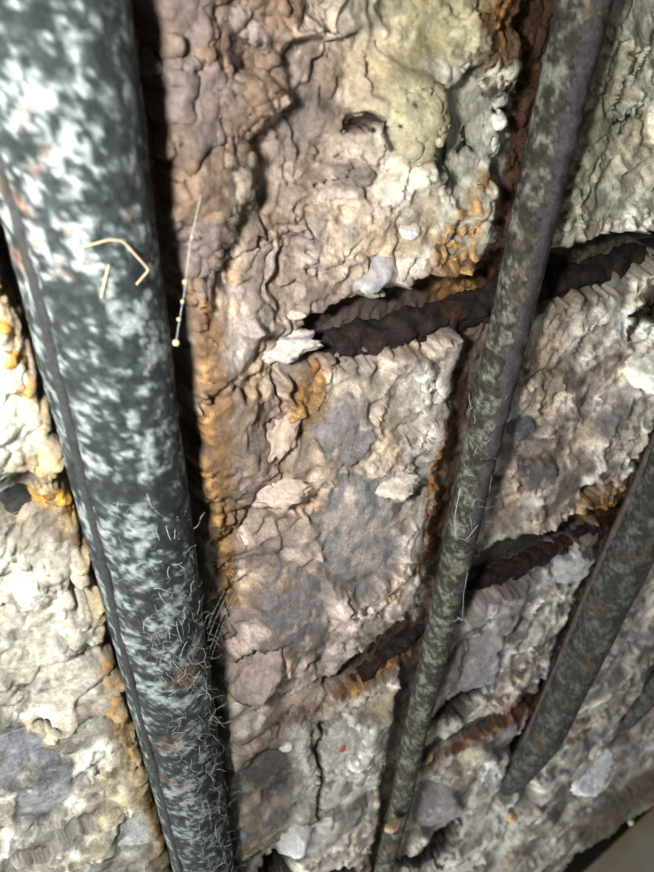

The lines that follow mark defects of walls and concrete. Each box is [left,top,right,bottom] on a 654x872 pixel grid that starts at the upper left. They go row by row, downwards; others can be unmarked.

peeling [133,0,303,320]
spalling [424,57,519,255]
corrosion [428,0,553,300]
spalling [0,532,124,709]
corrosion [0,284,173,872]
corrosion [192,300,239,606]
flaking render [251,361,454,661]
corrosion [576,481,627,539]
spalling [245,714,390,856]
crack [309,722,327,821]
spalling [412,712,523,872]
corrosion [420,686,543,767]